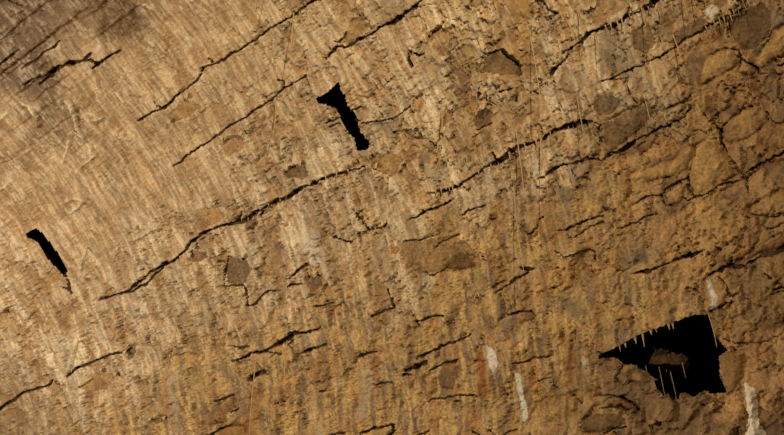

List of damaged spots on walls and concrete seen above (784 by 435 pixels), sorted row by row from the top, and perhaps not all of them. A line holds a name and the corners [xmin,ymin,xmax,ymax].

crack [137,0,321,121]
crack [325,0,422,60]
crack [407,52,425,68]
crack [173,74,307,167]
spalling [316,82,404,177]
crack [325,105,411,128]
spalling [27,228,68,283]
crack [100,166,366,306]
spalling [598,314,744,400]
water stain [744,382,766,435]